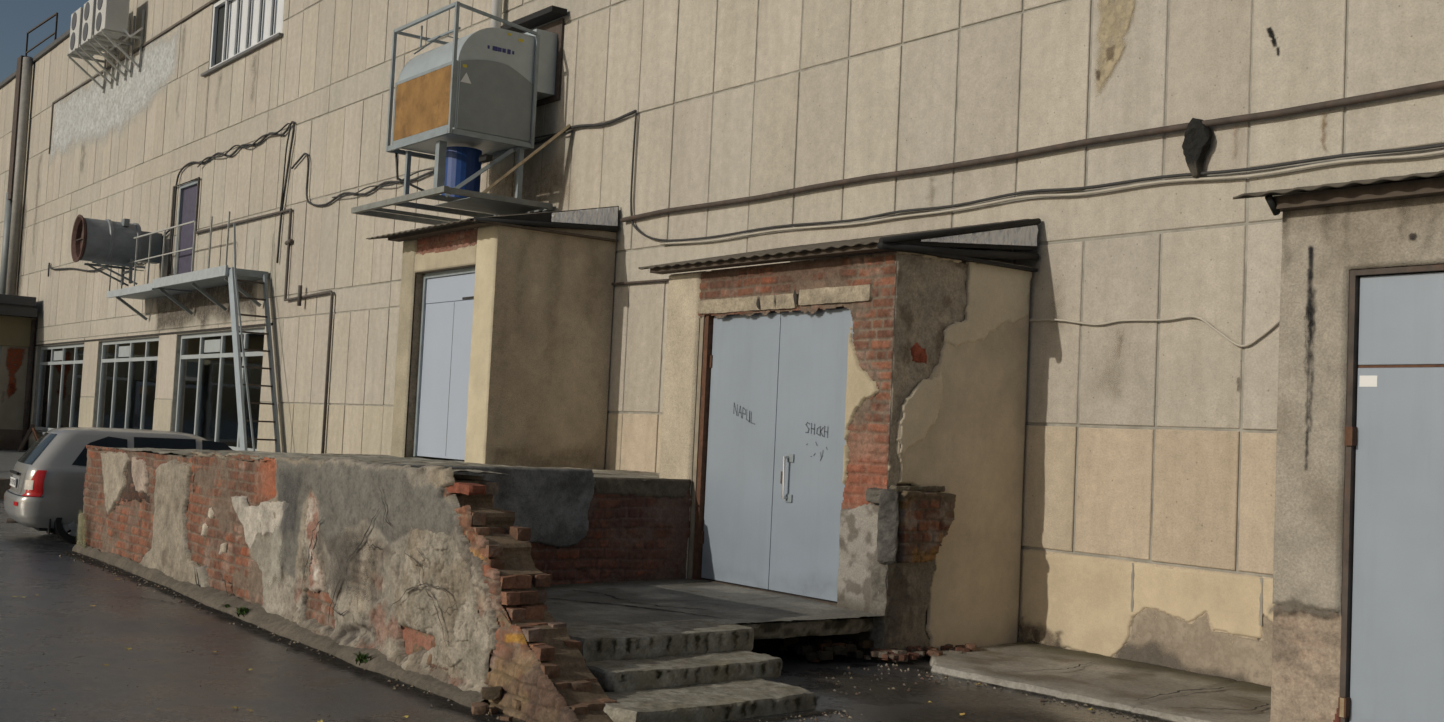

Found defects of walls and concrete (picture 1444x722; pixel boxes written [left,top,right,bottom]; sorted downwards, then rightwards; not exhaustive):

peeling [1096,0,1134,91]
flaking render [2,348,25,401]
flaking render [698,251,1032,510]
water stain [1305,246,1315,469]
flaking render [82,445,288,605]
peeling [305,492,335,629]
flaking render [531,477,692,585]
flaking render [1020,549,1341,722]